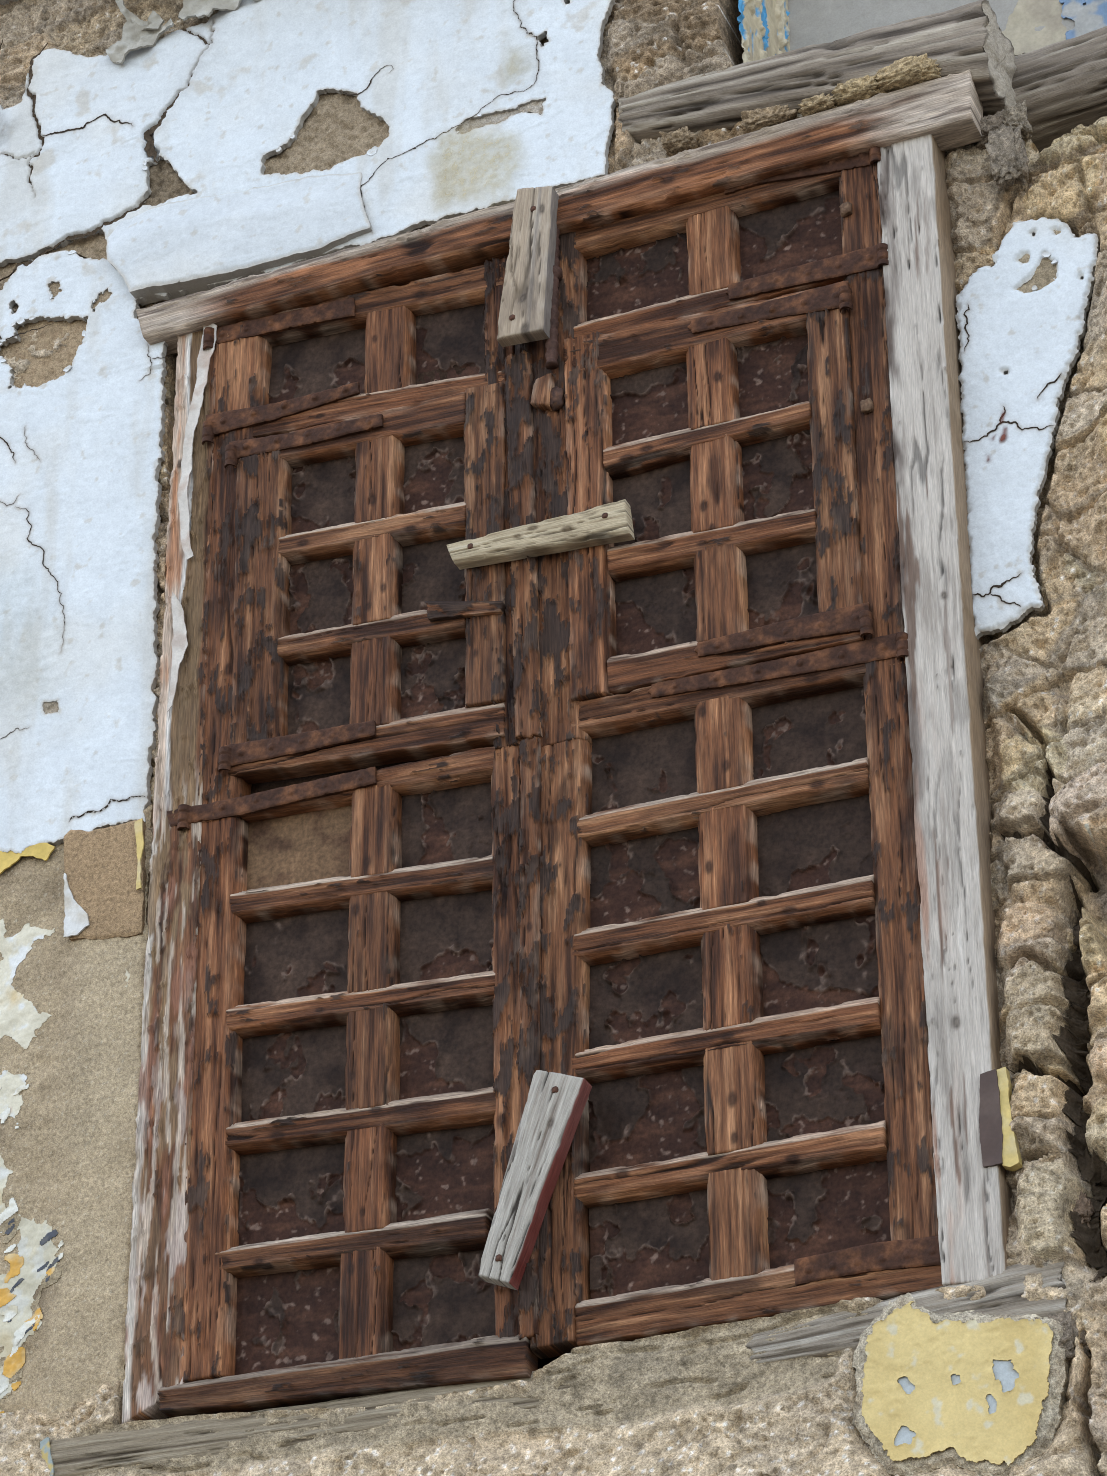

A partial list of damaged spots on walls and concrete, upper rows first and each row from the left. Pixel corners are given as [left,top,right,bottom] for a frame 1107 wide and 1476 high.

crack [0,30,215,185]
spalling [264,93,389,175]
crack [339,65,394,95]
crack [360,0,539,208]
spalling [0,290,112,388]
crack [0,197,150,281]
spalling [1016,252,1058,293]
crack [2,498,65,650]
crack [70,796,145,820]
peeling [0,873,90,1049]
peeling [0,1155,64,1413]
peeling [861,1301,1054,1467]